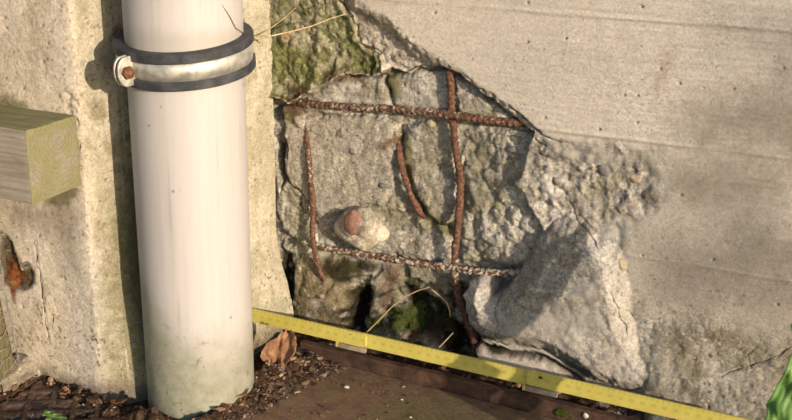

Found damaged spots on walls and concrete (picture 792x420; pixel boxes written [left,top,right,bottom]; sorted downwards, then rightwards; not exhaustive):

corrosion [291,69,526,354]
spalling [268,0,667,358]
corrosion [5,251,27,303]
crack [34,241,54,335]
crack [719,346,792,378]